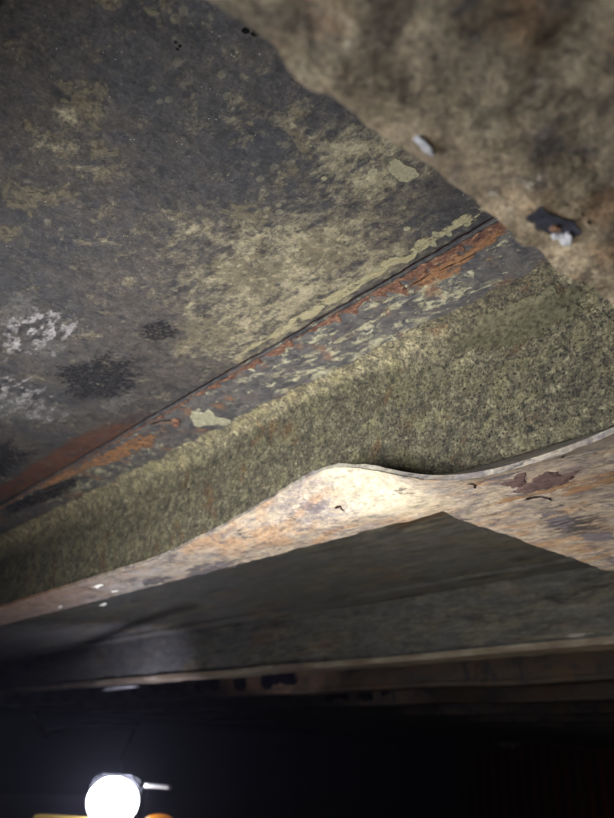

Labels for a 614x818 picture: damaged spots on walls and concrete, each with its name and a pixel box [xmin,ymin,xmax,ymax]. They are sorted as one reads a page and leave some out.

spalling [525,207,582,246]
rust [407,230,506,295]
rust [443,283,590,356]
peeling [190,410,231,427]
rust [37,418,180,488]
peeling [187,560,237,576]